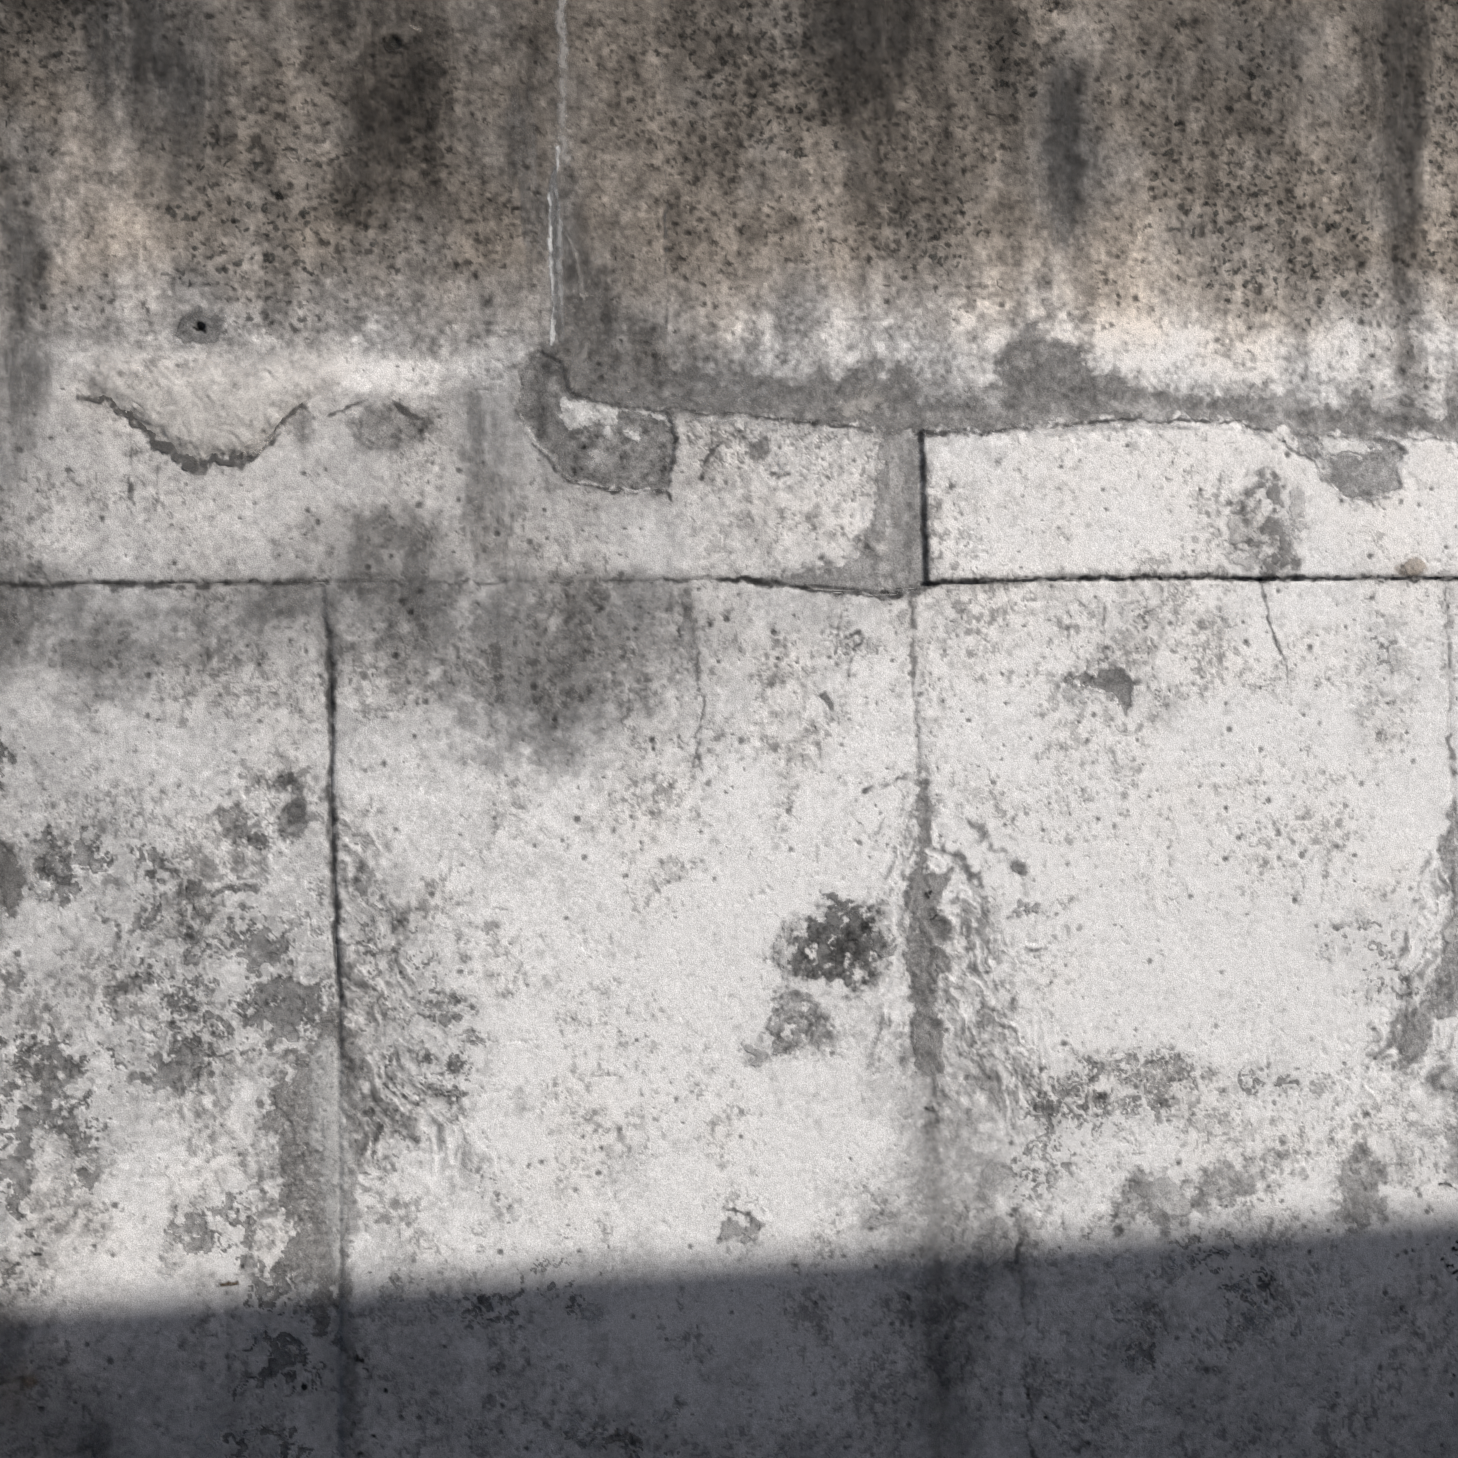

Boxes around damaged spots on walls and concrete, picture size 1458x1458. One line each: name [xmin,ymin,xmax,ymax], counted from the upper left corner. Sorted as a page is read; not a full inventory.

damp [1,135,45,324]
damp [53,0,200,142]
damp [157,137,325,322]
damp [282,0,454,275]
damp [506,0,667,388]
damp [656,0,915,172]
mould [881,174,983,271]
damp [969,16,1082,245]
damp [1149,0,1458,326]
damp [6,346,50,451]
spalling [512,322,1458,502]
crack [1012,1205,1036,1325]